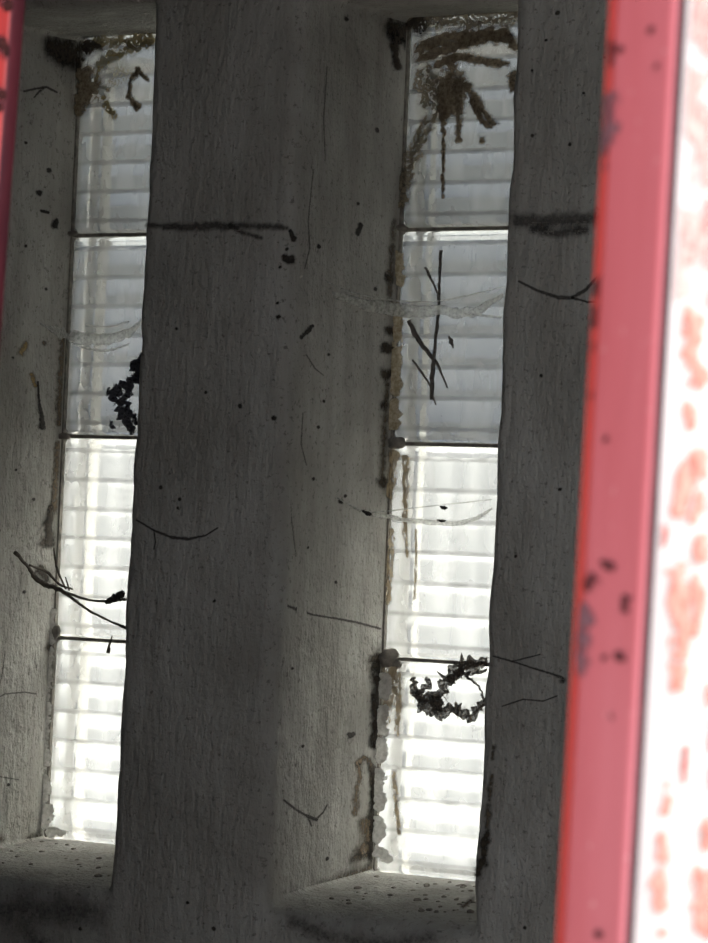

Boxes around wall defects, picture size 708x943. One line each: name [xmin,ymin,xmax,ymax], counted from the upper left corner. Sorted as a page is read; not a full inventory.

crack [145,69,327,269]
peeling [372,673,393,864]